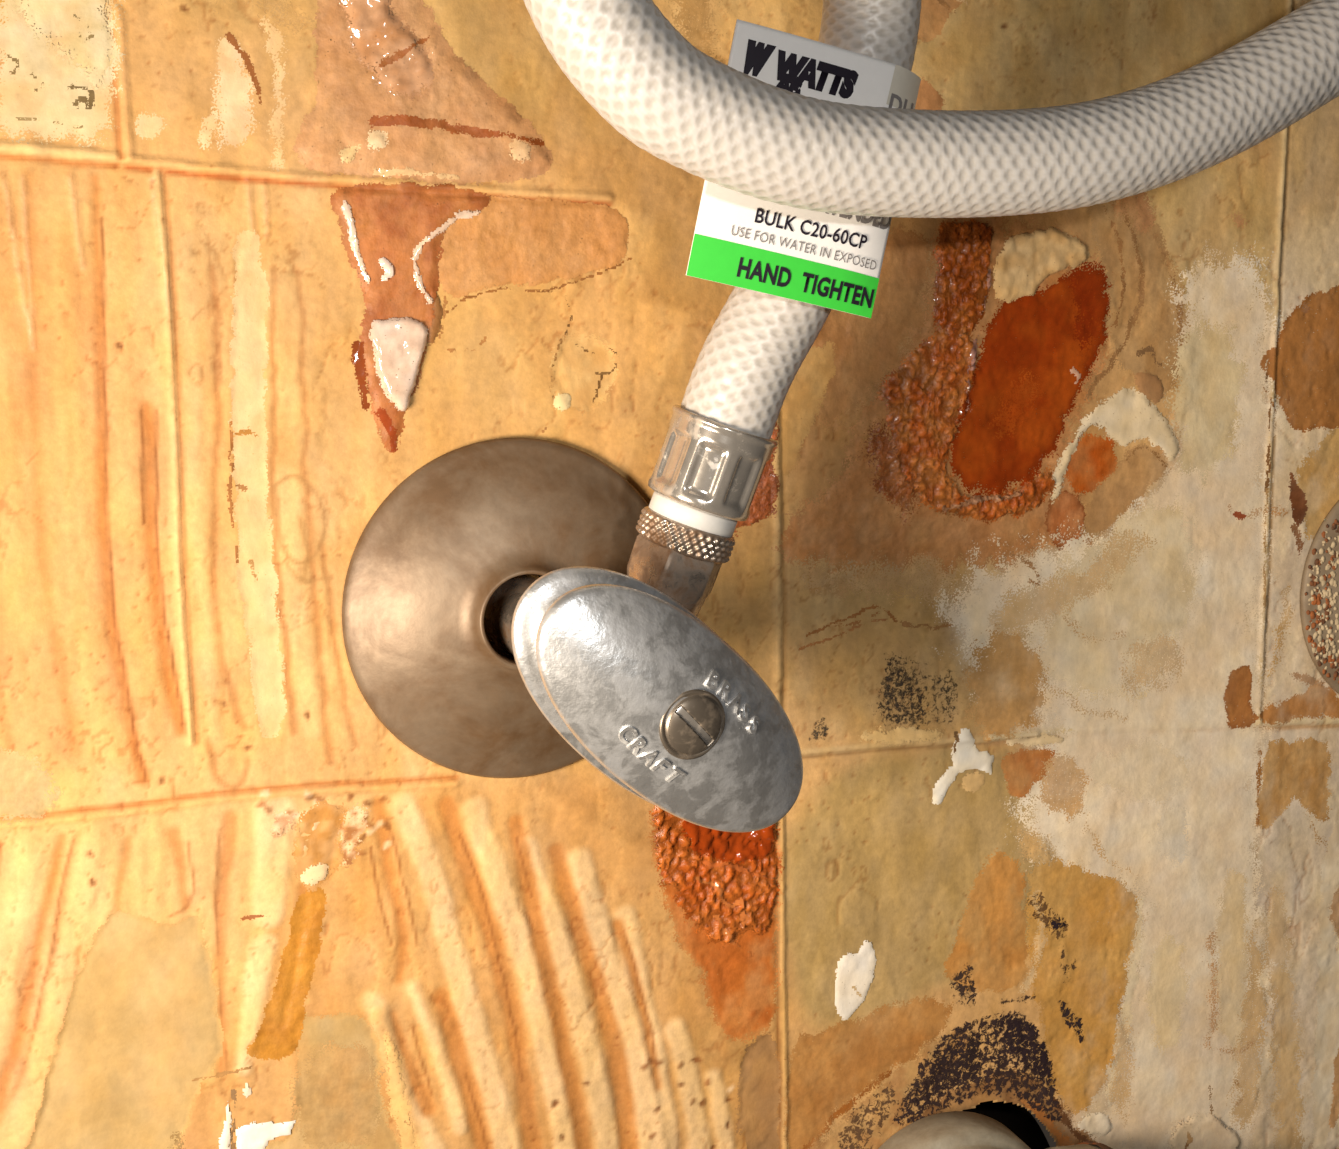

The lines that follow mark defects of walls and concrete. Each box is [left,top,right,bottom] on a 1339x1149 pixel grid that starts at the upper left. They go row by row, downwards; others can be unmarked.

rust [733,214,1119,591]
mould [876,651,958,729]
peeling [786,227,1339,1149]
rust [648,806,785,1043]
water stain [781,823,1142,1149]